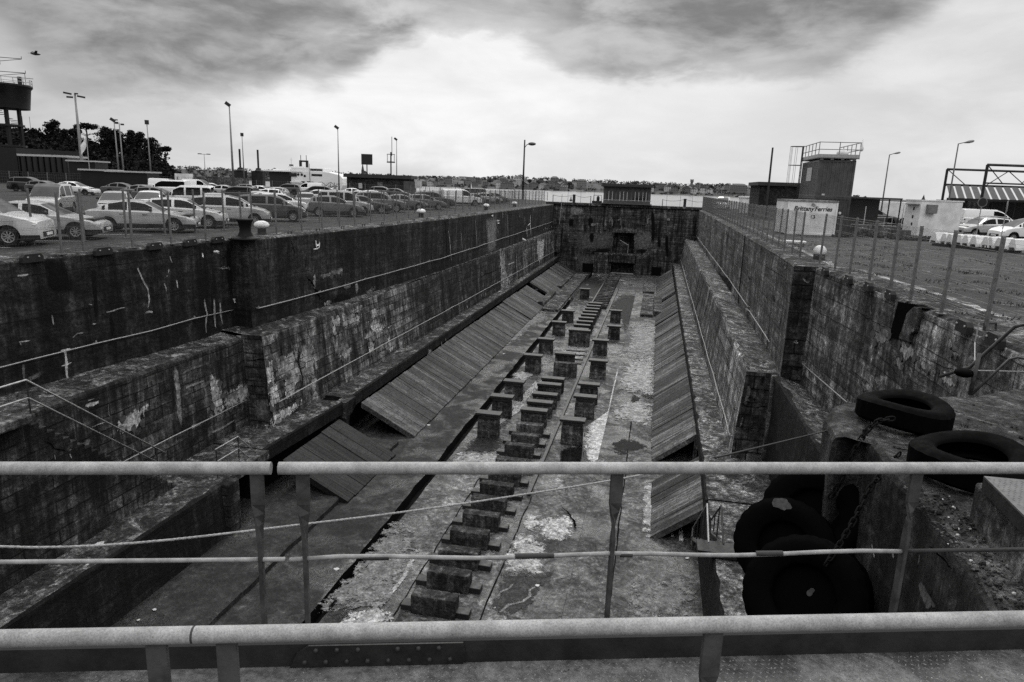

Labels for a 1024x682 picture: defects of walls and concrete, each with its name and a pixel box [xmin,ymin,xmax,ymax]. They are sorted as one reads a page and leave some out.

spalling [871,321,958,387]